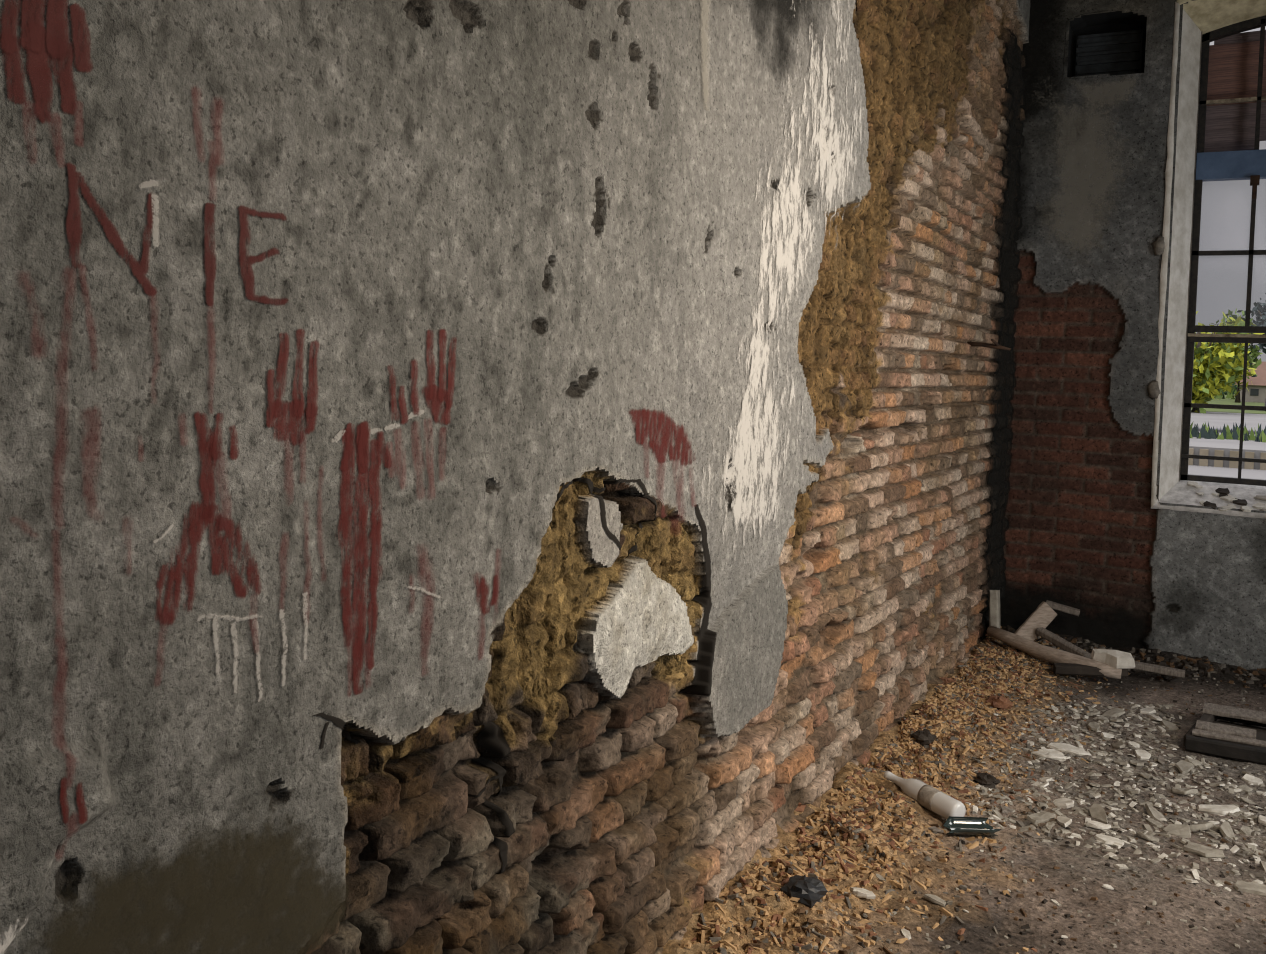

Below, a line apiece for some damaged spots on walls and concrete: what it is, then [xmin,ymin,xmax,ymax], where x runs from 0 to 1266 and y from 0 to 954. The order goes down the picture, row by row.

water stain [701,0,709,109]
spalling [307,0,1182,954]
peeling [0,919,26,954]
water stain [43,823,349,954]